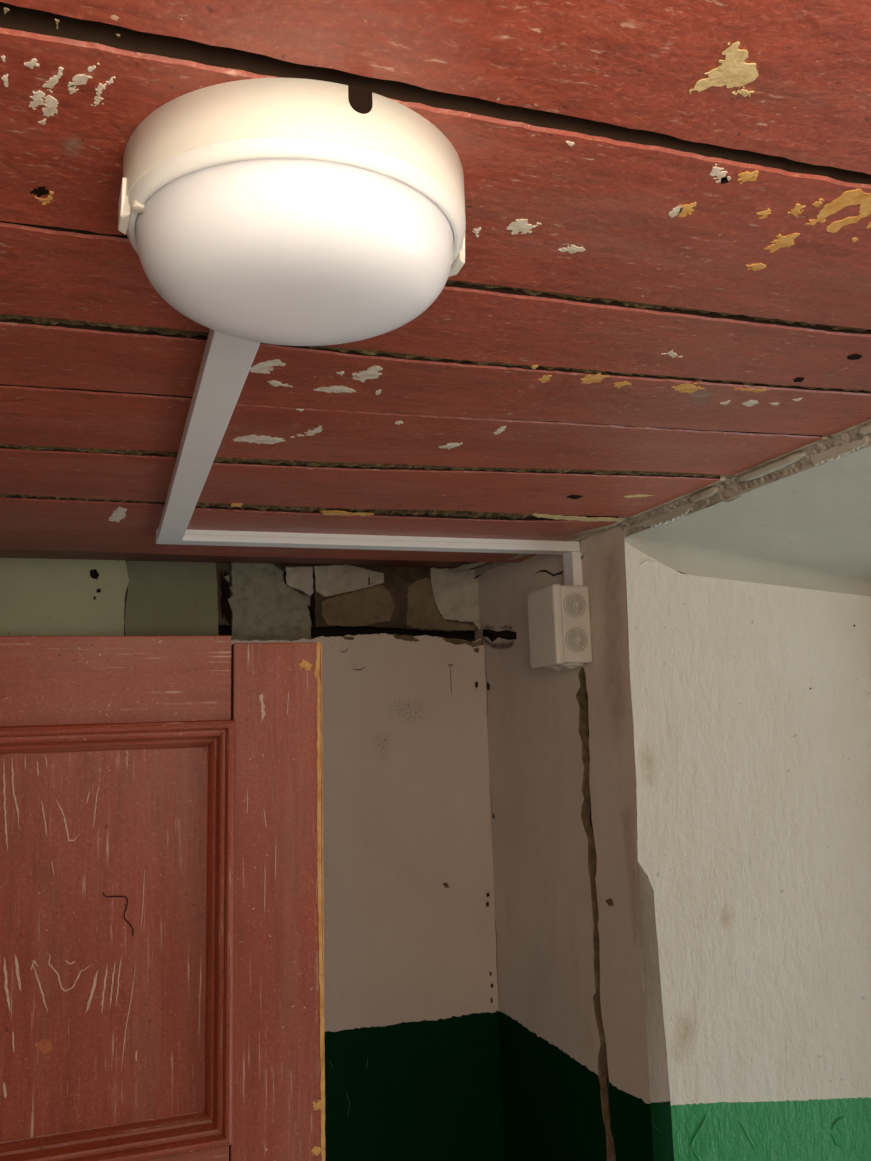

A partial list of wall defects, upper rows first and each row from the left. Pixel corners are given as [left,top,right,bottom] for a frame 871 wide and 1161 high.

peeling [29,63,116,125]
peeling [689,41,758,97]
peeling [710,164,759,184]
peeling [668,202,696,219]
peeling [746,189,871,271]
peeling [250,359,293,388]
peeling [313,366,383,395]
peeling [720,388,802,407]
peeling [233,426,322,444]
flaking render [533,422,871,542]
flaking render [285,554,529,653]
crack [576,667,616,1161]